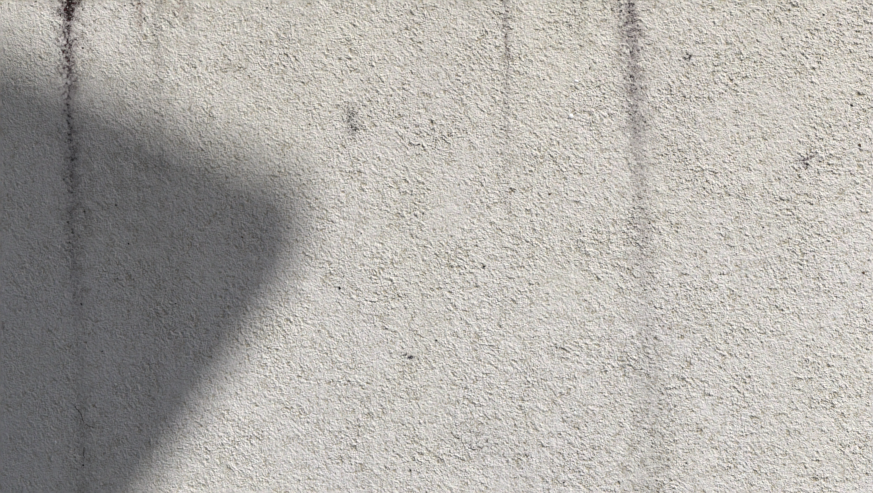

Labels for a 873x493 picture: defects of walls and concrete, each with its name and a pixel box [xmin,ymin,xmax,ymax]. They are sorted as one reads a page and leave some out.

damp [51,0,96,196]